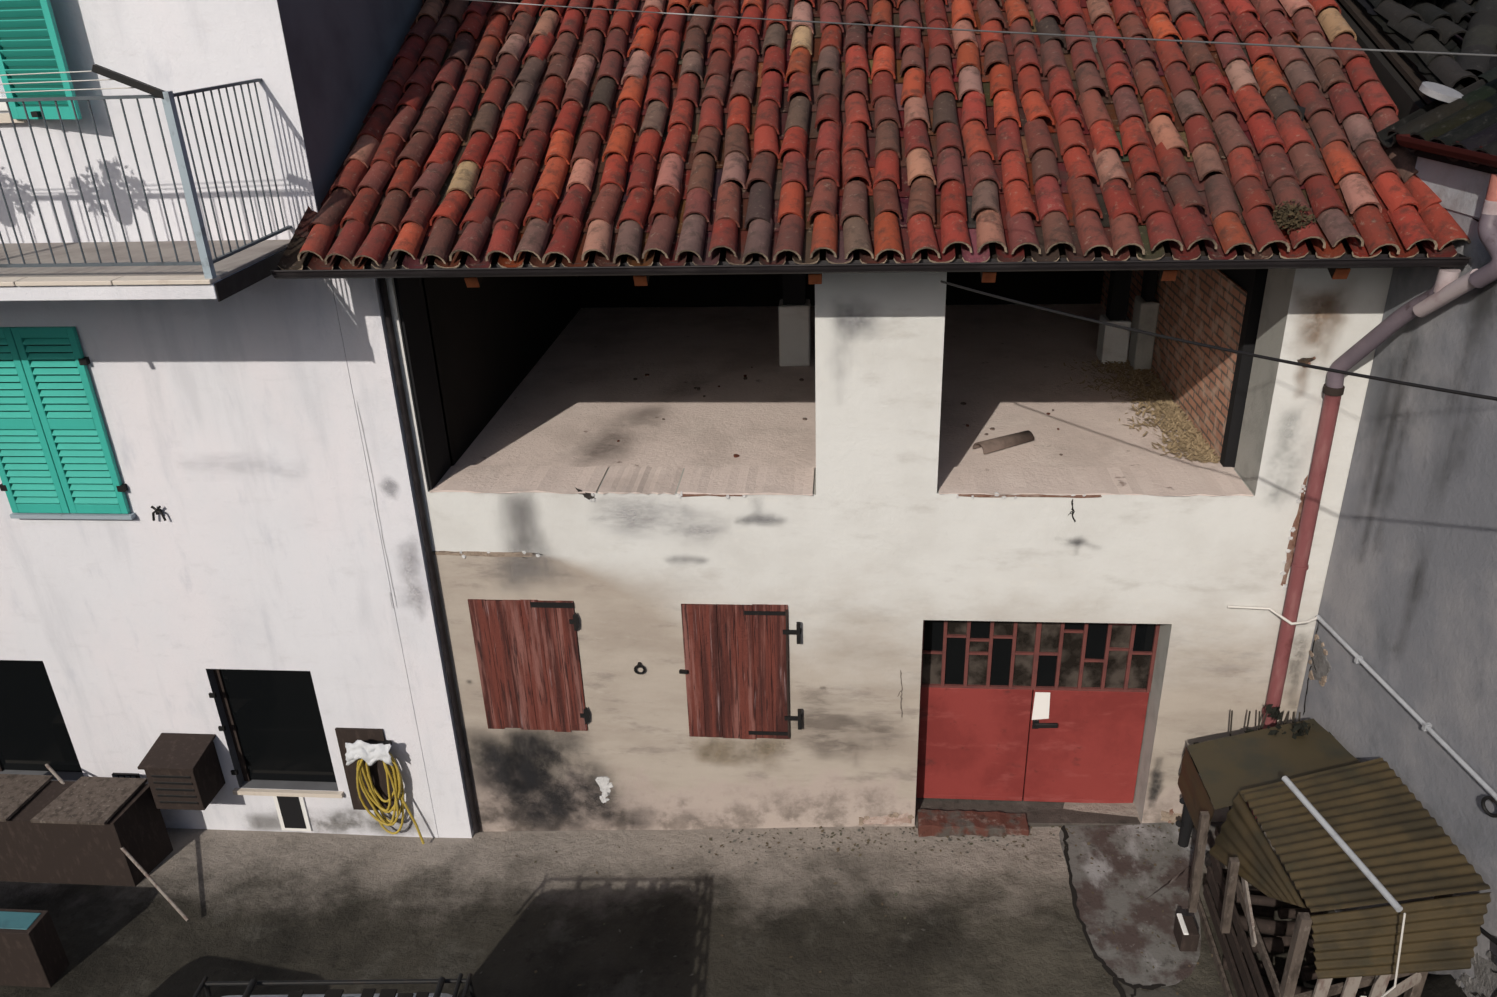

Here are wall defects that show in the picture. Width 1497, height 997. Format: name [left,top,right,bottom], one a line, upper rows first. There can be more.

spalling [1456,950,1497,997]